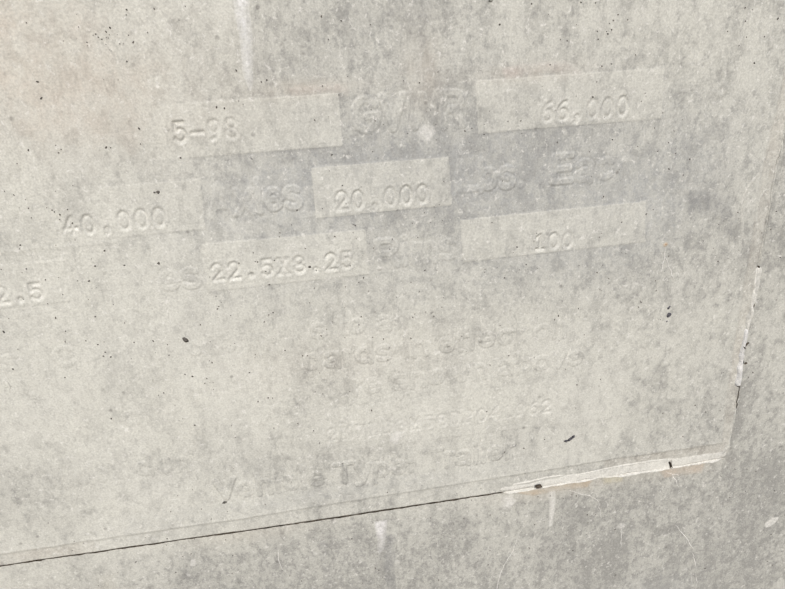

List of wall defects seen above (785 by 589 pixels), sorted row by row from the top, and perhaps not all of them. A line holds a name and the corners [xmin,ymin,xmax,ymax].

peeling [735,266,762,409]
peeling [501,452,726,494]